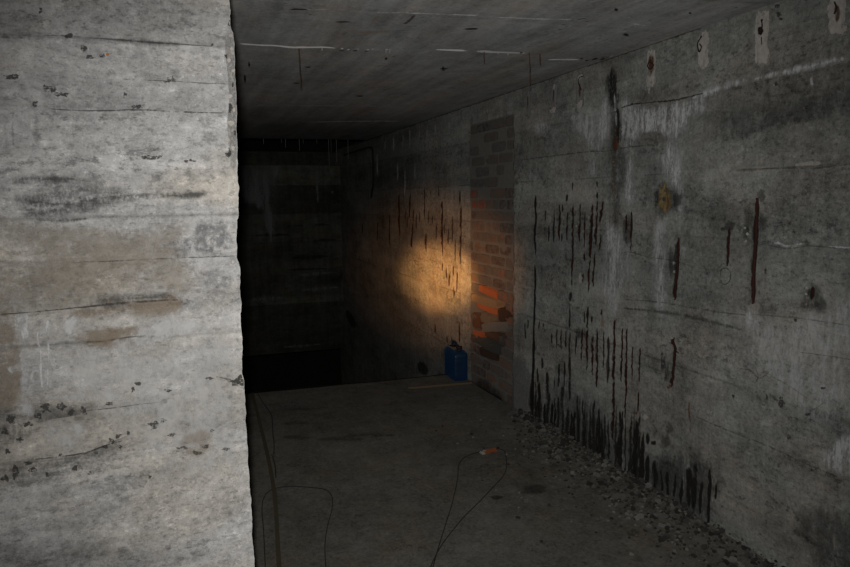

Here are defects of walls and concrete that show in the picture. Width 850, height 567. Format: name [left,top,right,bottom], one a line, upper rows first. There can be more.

leakage [579,69,744,144]
efflorescence [755,58,843,80]
leakage [25,195,132,221]
rust [544,181,648,439]
leakage [531,358,717,523]